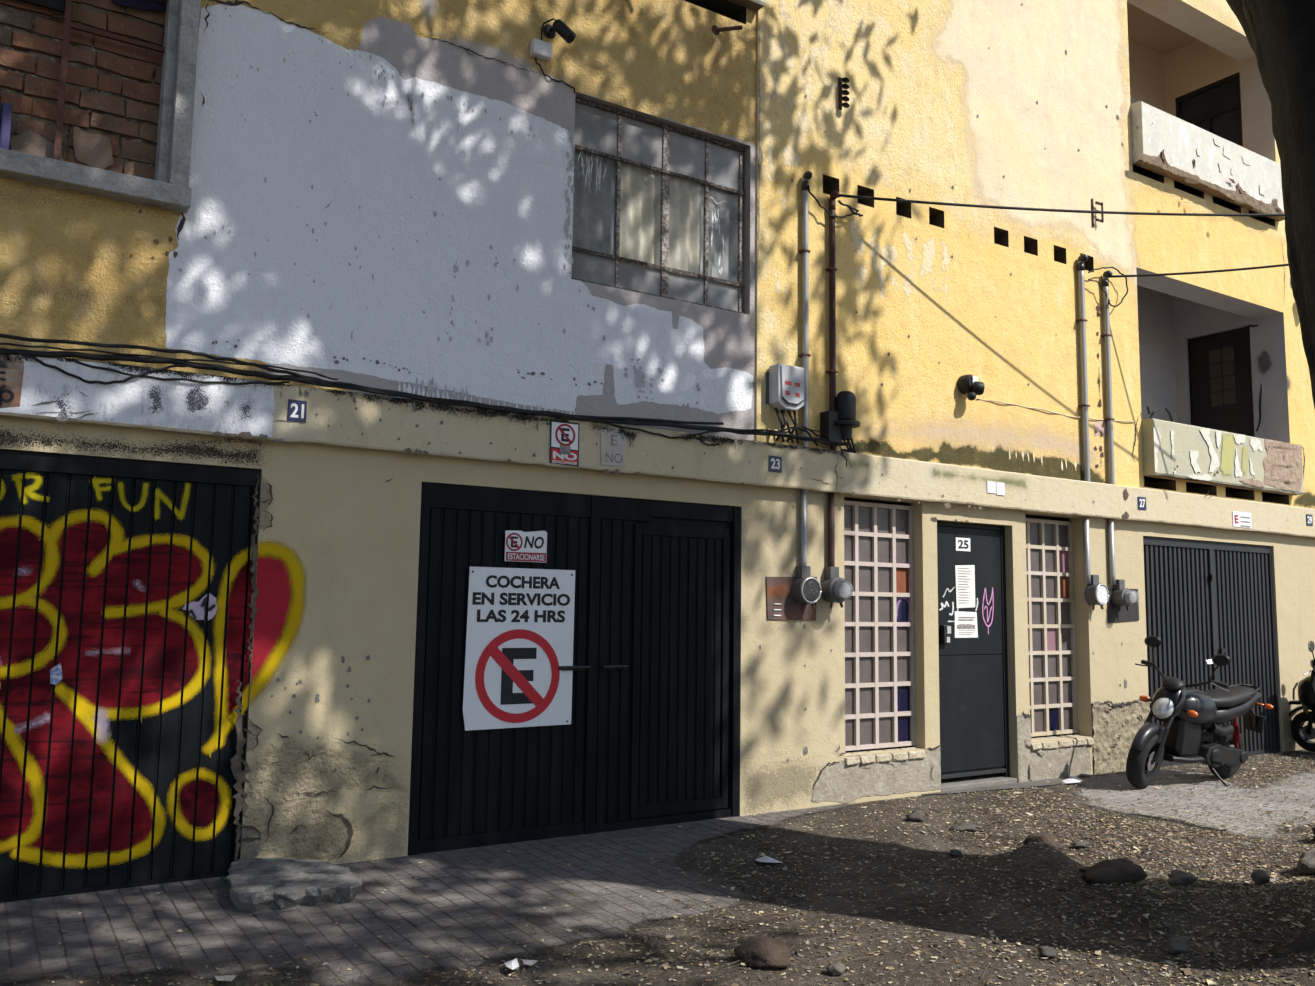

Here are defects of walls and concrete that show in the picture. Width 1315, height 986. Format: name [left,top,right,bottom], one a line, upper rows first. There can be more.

peeling [382,93,535,137]
spalling [1140,138,1284,214]
peeling [624,357,665,400]
spalling [213,431,282,443]
damp [675,400,1108,495]
flaking render [1153,427,1303,492]
spalling [258,477,273,530]
spalling [1017,680,1151,783]
spalling [239,716,410,863]
spalling [812,746,941,803]